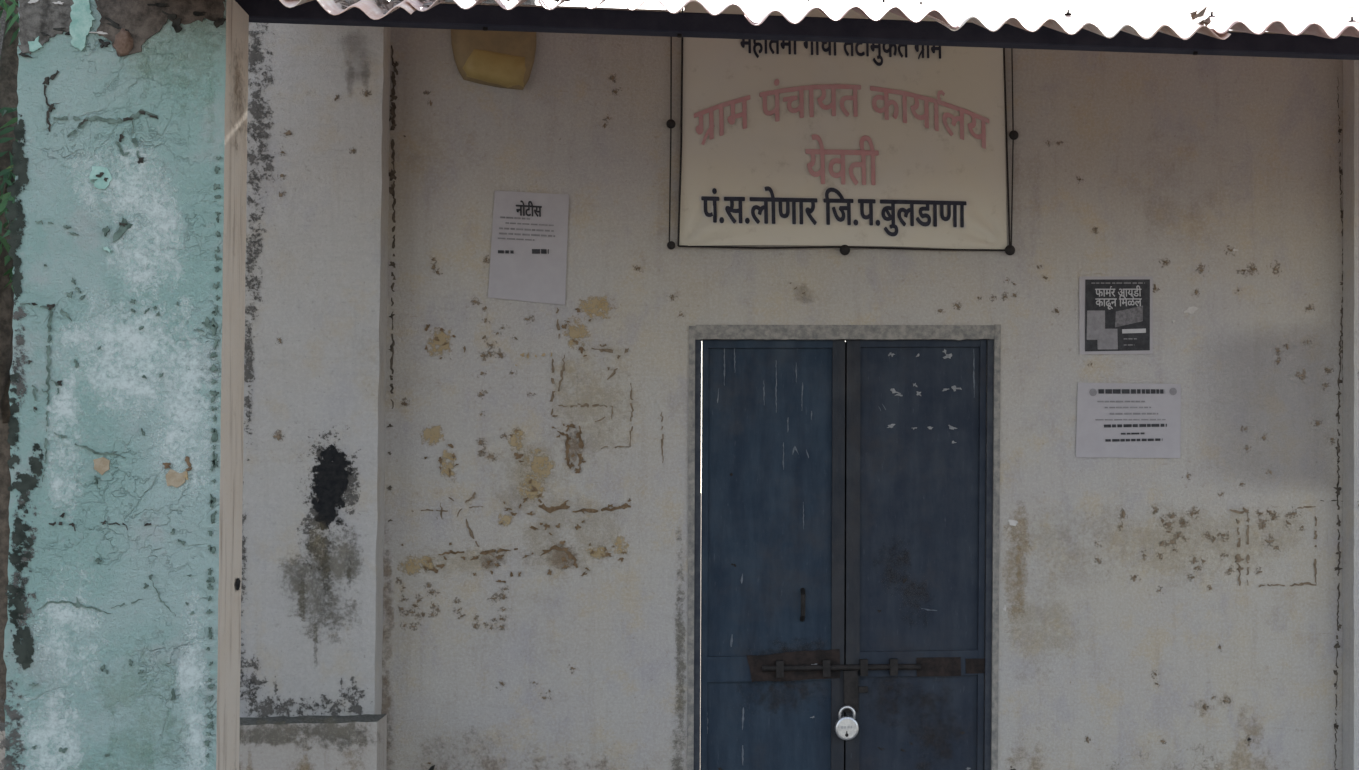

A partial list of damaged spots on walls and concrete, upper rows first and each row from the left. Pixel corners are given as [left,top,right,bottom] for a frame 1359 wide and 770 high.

peeling [425,297,552,416]
peeling [561,296,612,357]
flaking render [93,457,110,484]
water stain [284,427,361,652]
peeling [396,424,629,630]
peeling [1142,507,1200,561]
peeling [1187,531,1234,590]
peeling [1255,507,1303,551]
crack [37,579,176,616]
water stain [240,513,373,749]